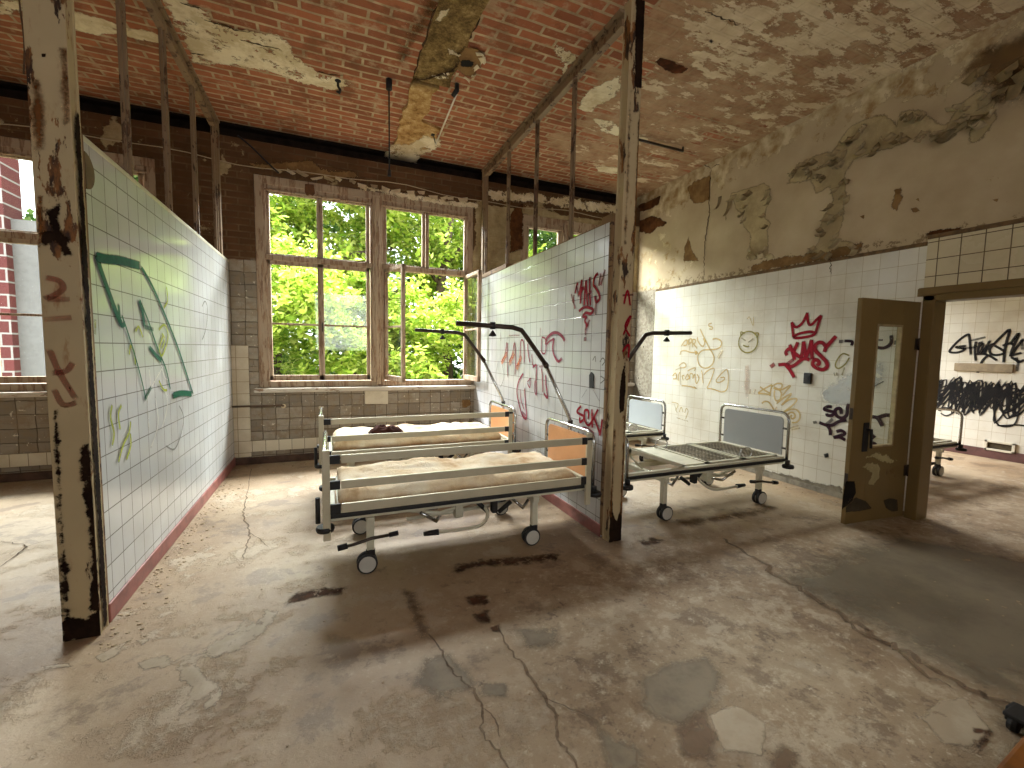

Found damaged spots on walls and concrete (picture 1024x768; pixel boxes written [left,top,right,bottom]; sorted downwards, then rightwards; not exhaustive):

peeling [161,0,348,90]
spalling [434,47,486,84]
peeling [634,0,688,88]
peeling [384,135,441,163]
peeling [488,76,667,253]
peeling [687,90,997,271]
peeling [38,196,72,256]
spalling [683,239,698,261]
crack [242,469,267,558]
crack [725,539,1011,704]
crack [429,635,509,768]
crack [496,627,593,768]